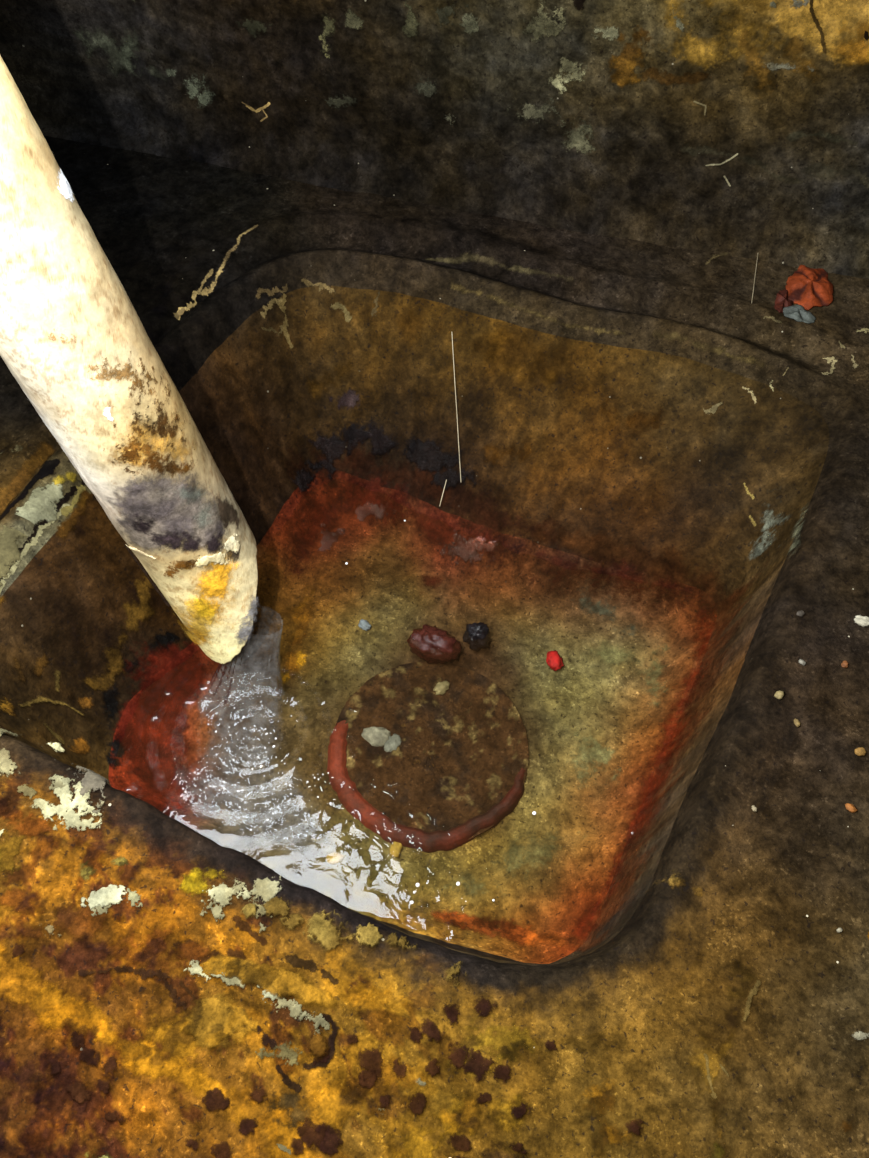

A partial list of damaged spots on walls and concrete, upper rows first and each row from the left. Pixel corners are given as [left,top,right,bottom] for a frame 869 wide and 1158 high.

corrosion [53,472,90,538]
corrosion [164,559,198,578]
leakage [235,597,258,644]
corrosion [282,586,315,683]
corrosion [0,574,205,819]
leakage [180,868,218,893]
corrosion [0,886,557,1158]
corrosion [626,1118,644,1136]